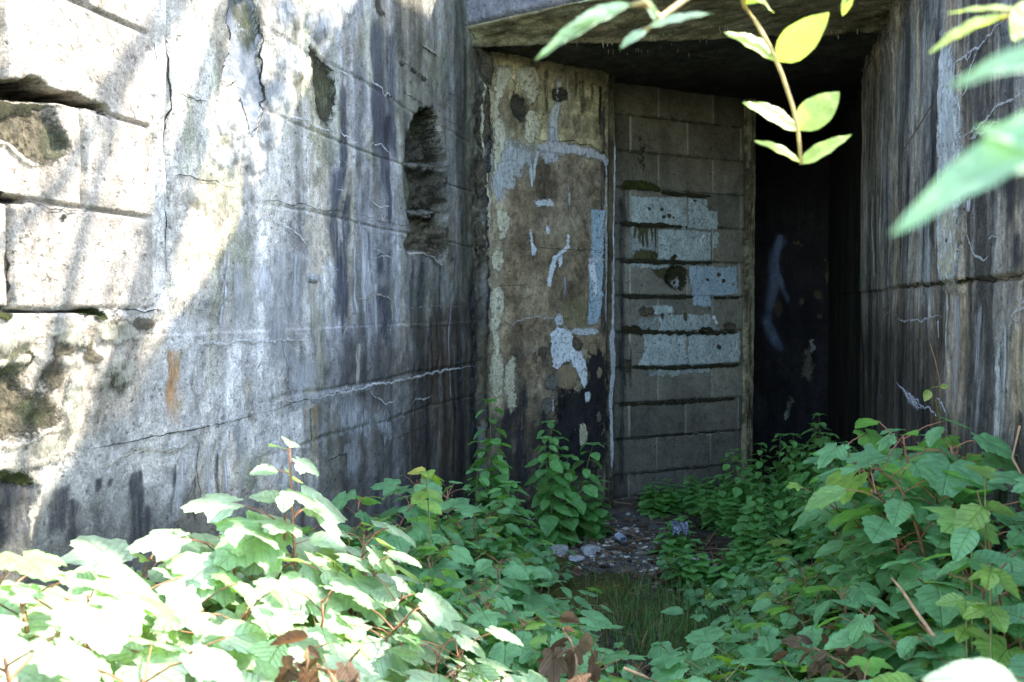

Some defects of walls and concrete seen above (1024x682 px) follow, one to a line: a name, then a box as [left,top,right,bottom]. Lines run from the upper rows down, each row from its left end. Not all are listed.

spalling [211,0,355,175]
crack [153,34,234,321]
water stain [170,22,631,494]
peeling [488,64,609,414]
peeling [630,196,741,378]
rust [168,349,182,406]
water stain [171,459,184,511]
crack [77,347,474,497]
peeling [579,410,602,445]